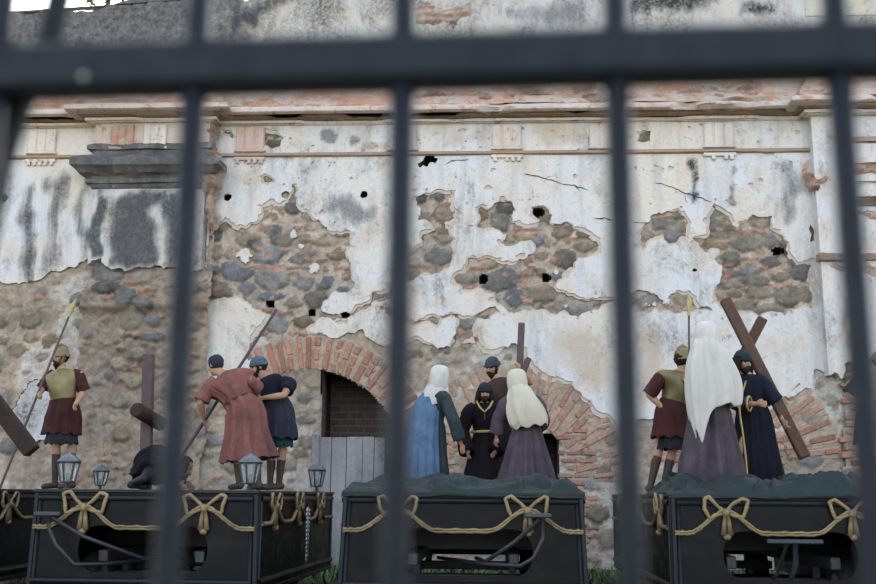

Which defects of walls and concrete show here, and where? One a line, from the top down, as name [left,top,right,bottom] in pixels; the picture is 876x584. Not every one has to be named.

water stain [19,190,35,281]
water stain [45,177,67,228]
water stain [75,190,175,267]
spalling [205,122,385,357]
spalling [412,192,609,410]
crack [526,174,587,191]
spalling [638,205,813,316]
peeling [13,379,50,443]
spalling [198,399,248,490]
spalling [261,366,322,491]
spalling [567,401,616,570]
spalling [768,369,846,474]